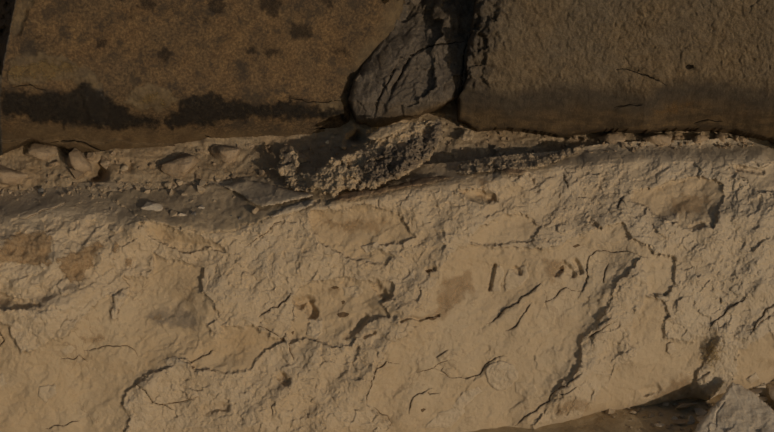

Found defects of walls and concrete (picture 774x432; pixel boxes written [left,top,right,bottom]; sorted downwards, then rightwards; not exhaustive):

leakage [1,83,346,130]
crack [287,0,475,127]